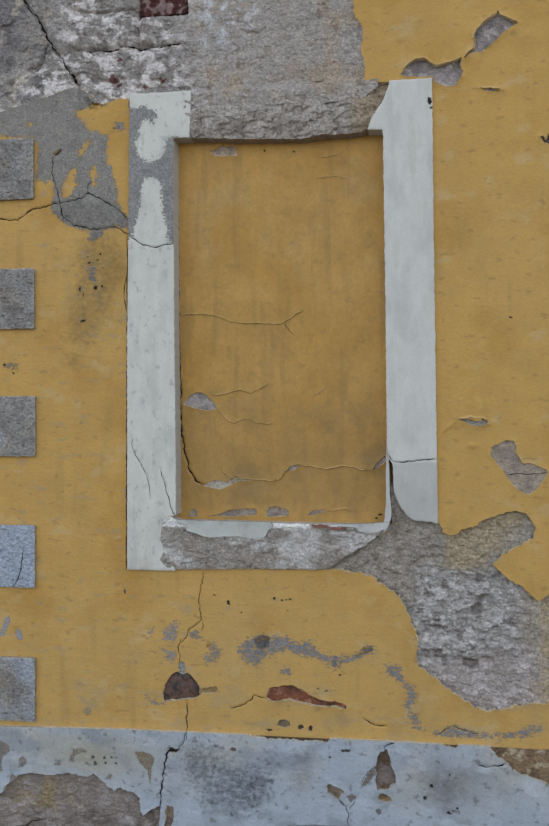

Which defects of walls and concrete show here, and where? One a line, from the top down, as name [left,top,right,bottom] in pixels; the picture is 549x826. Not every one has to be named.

flaking render [401,12,517,87]
flaking render [0,0,378,245]
crack [0,157,180,568]
crack [179,278,303,484]
peeling [176,506,289,540]
flaking render [144,620,218,707]
crack [178,579,203,662]
flaking render [267,668,346,708]
flaking render [309,483,549,710]
flaking render [0,740,174,826]
crack [160,702,188,805]
flaking render [362,749,396,801]